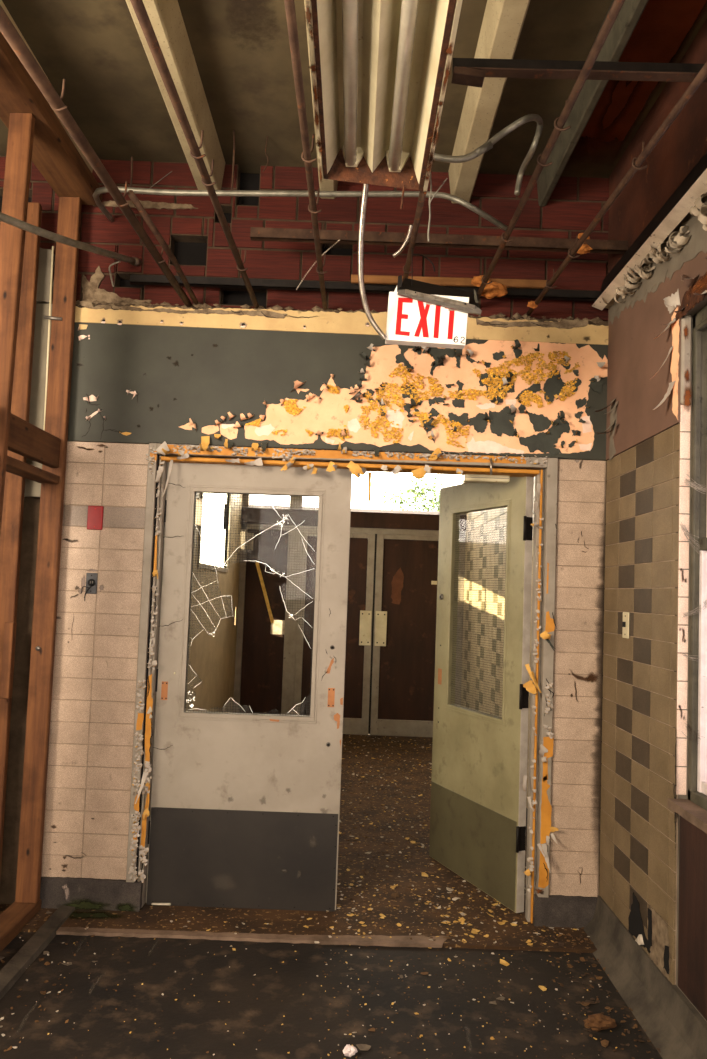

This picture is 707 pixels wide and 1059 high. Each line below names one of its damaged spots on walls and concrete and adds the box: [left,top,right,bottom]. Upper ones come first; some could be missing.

rust [426,43,453,173]
spalling [218,173,260,223]
spalling [174,242,207,266]
spalling [322,247,352,256]
peeling [602,192,707,312]
spalling [80,291,315,329]
peeling [128,319,618,894]
spalling [628,892,671,980]